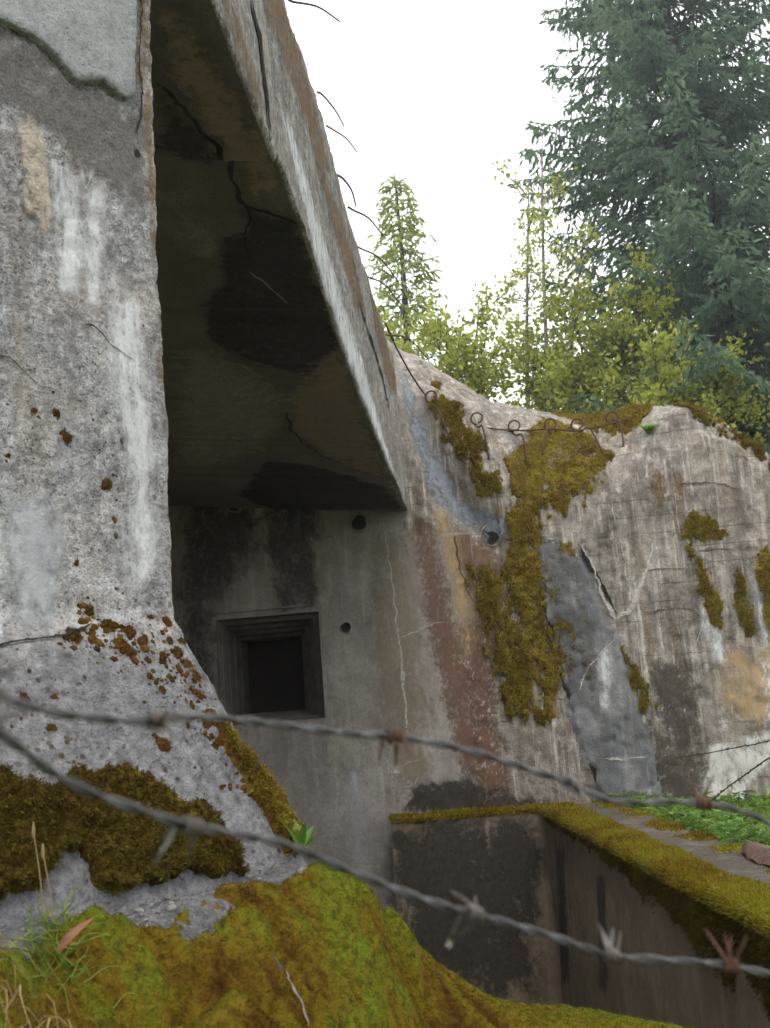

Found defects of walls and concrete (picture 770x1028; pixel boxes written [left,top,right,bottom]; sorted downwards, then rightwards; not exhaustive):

peeling [0,0,137,102]
spalling [17,115,56,235]
crack [136,0,296,265]
leakage [153,8,663,1003]
crack [579,544,617,614]